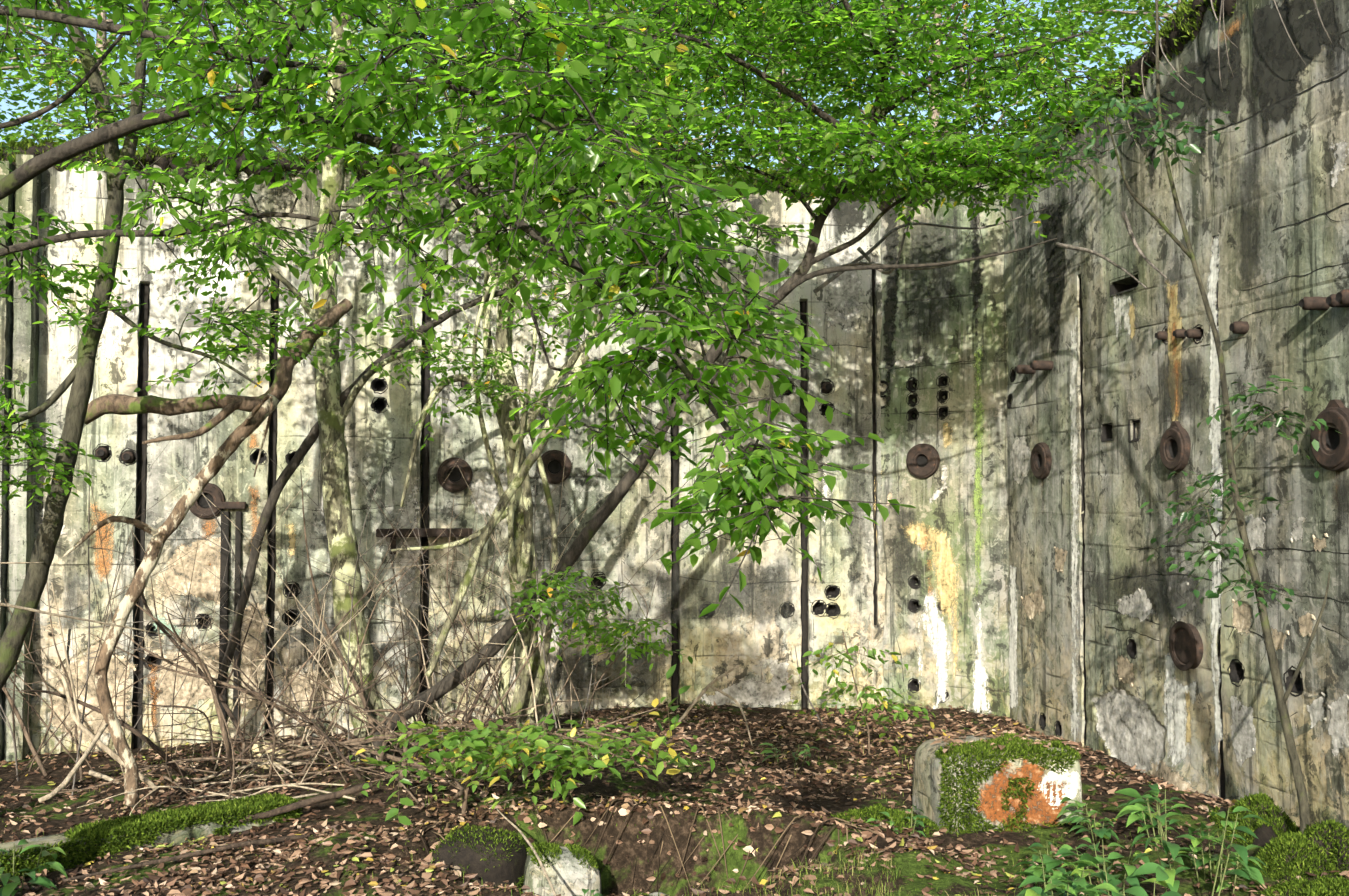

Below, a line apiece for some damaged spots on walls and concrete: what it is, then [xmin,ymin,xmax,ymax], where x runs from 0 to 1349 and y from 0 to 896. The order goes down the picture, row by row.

leakage [1129,0,1342,293]
rust [1167,284,1183,421]
rust [91,506,113,577]
rust [901,521,960,680]
efflorescence [918,592,951,709]
leakage [1039,203,1080,742]
spalling [1093,652,1166,773]
leakage [1095,237,1223,775]